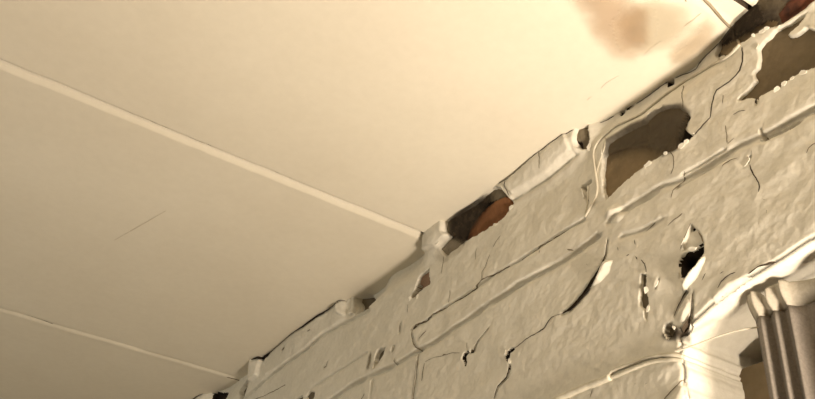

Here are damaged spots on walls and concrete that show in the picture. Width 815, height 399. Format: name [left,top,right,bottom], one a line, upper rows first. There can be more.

spalling [718,0,815,100]
spalling [577,127,591,152]
spalling [677,115,694,149]
spalling [600,146,667,198]
spalling [435,189,514,255]
crack [515,152,703,348]
spalling [681,228,704,252]
spalling [409,272,430,301]
crack [399,232,574,398]